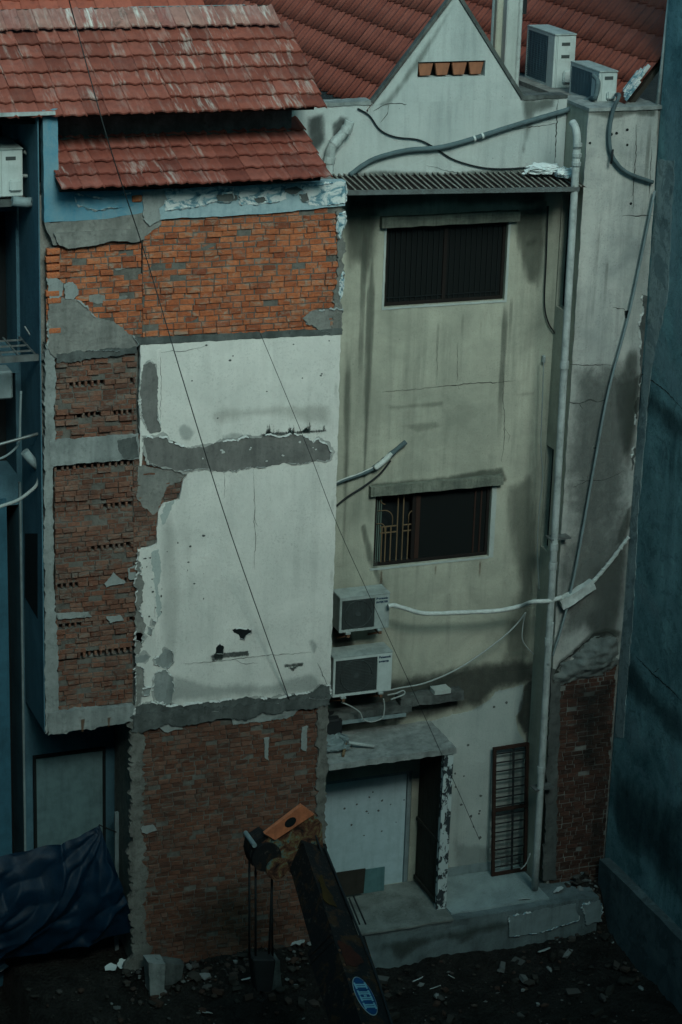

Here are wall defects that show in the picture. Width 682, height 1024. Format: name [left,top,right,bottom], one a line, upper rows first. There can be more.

peeling [74,181,348,240]
spalling [302,272,345,341]
spalling [46,278,335,525]
crack [386,344,510,461]
peeling [431,685,525,868]